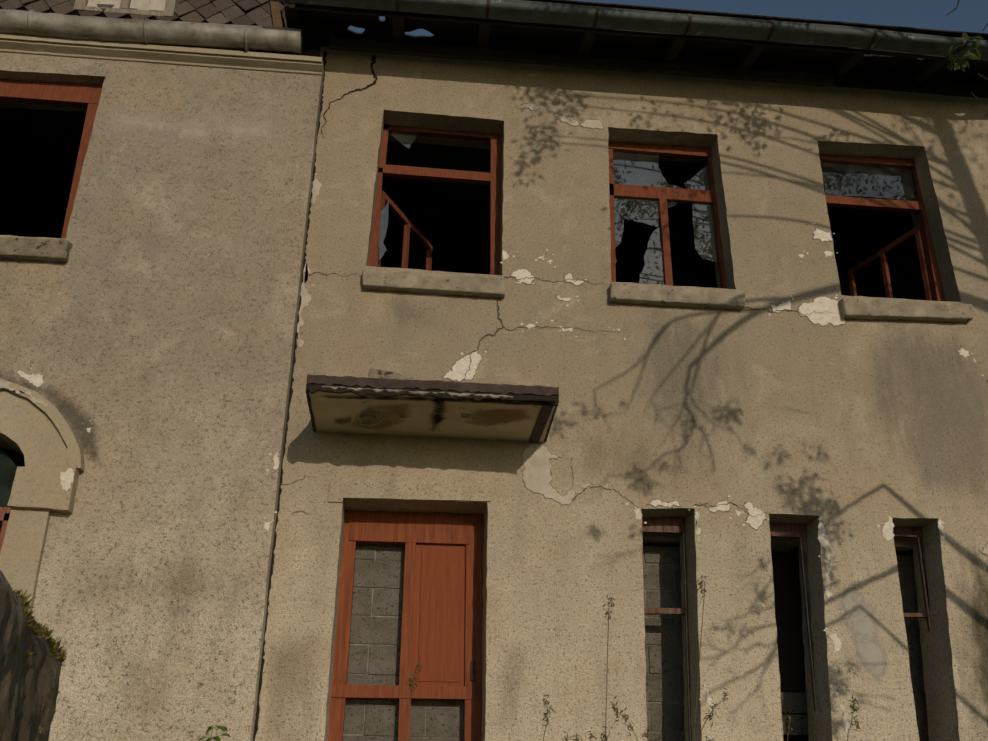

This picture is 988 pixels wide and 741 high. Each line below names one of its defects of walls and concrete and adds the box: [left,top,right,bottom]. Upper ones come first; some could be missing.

peeling [812,223,838,257]
crack [442,268,626,382]
peeling [0,368,48,407]
crack [253,52,378,741]
water stain [324,396,555,428]
crack [626,495,771,533]
peeling [818,508,886,680]